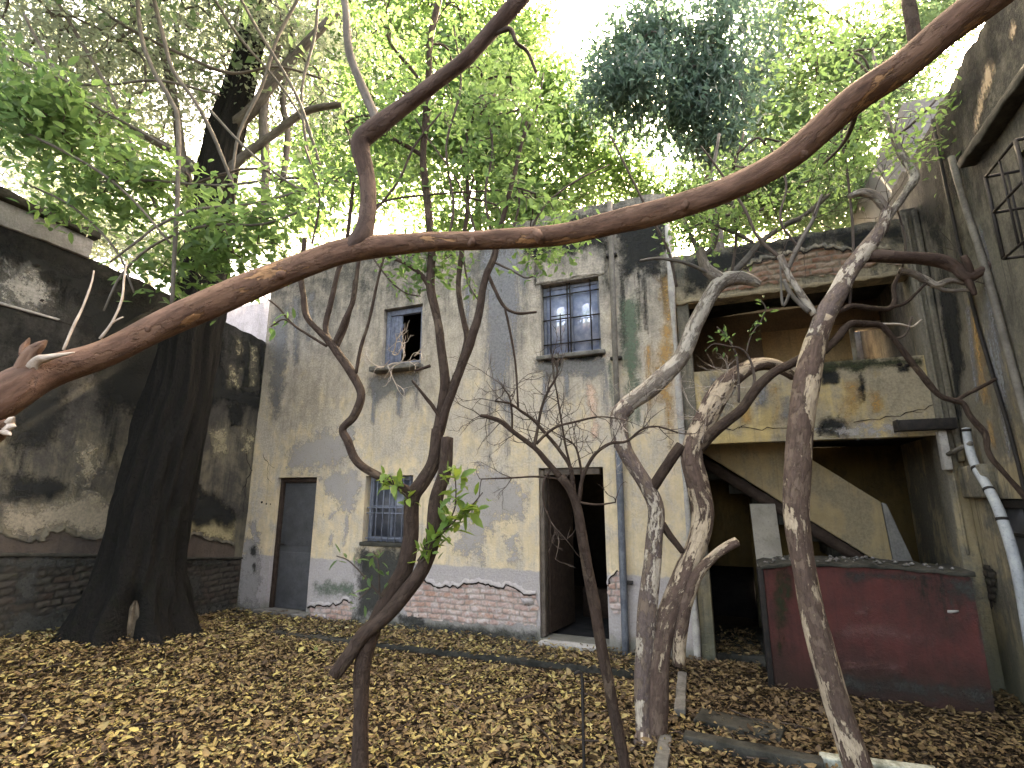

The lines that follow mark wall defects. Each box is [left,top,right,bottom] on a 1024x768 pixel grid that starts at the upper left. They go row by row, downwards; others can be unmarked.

leakage [481,224,670,417]
leakage [2,321,65,367]
leakage [822,357,922,401]
leakage [5,381,72,502]
leakage [814,418,894,437]
crack [856,405,932,422]
flaking render [0,444,110,558]
flaking render [187,519,236,557]
flaking render [403,461,539,627]
flaking render [307,595,353,622]